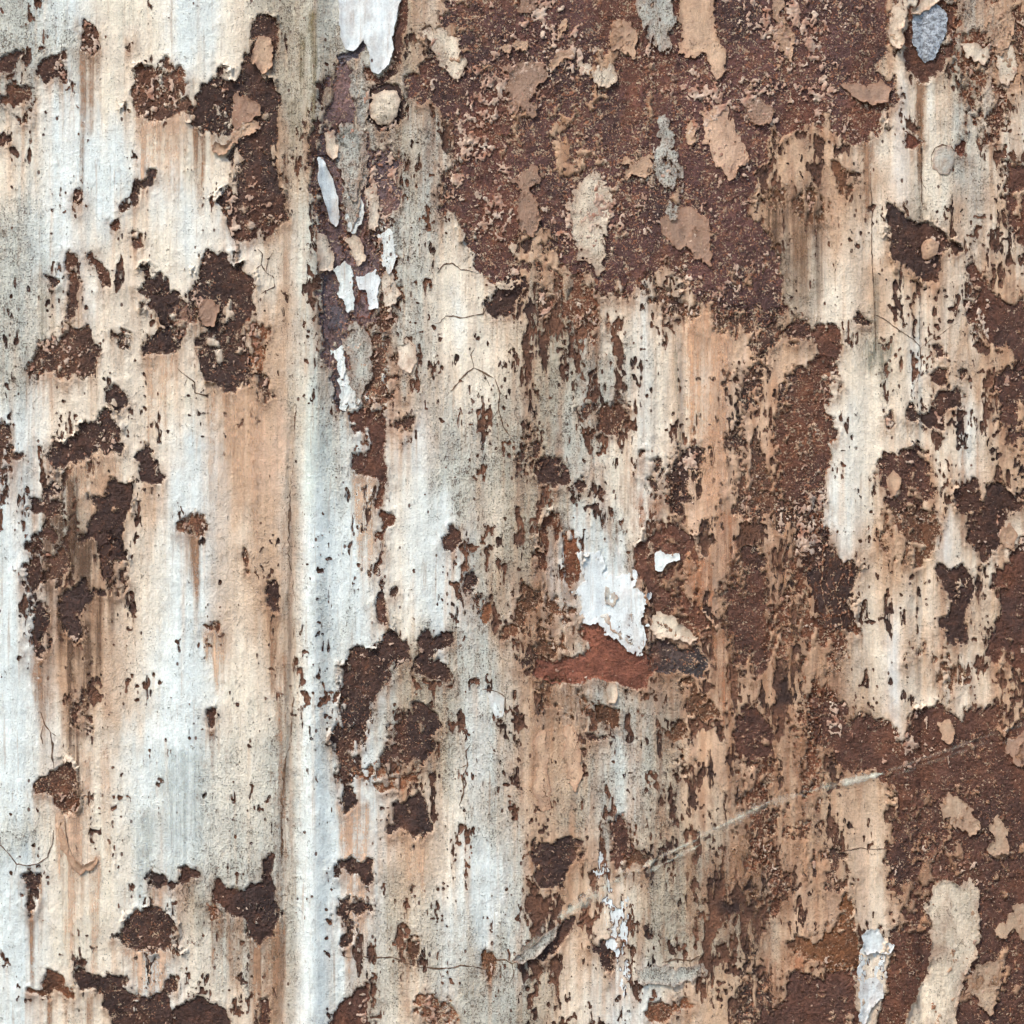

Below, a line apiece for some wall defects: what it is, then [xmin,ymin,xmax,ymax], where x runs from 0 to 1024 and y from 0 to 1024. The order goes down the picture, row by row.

peeling [502,0,726,119]
peeling [621,104,749,267]
crack [435,302,490,324]
crack [451,350,510,436]
peeling [571,550,698,657]
rust [465,673,492,693]
rust [427,823,475,931]
rust [495,757,521,795]
rust [507,795,523,829]
peeling [939,791,1010,857]
rust [389,885,461,1024]
peeling [905,877,1005,1024]